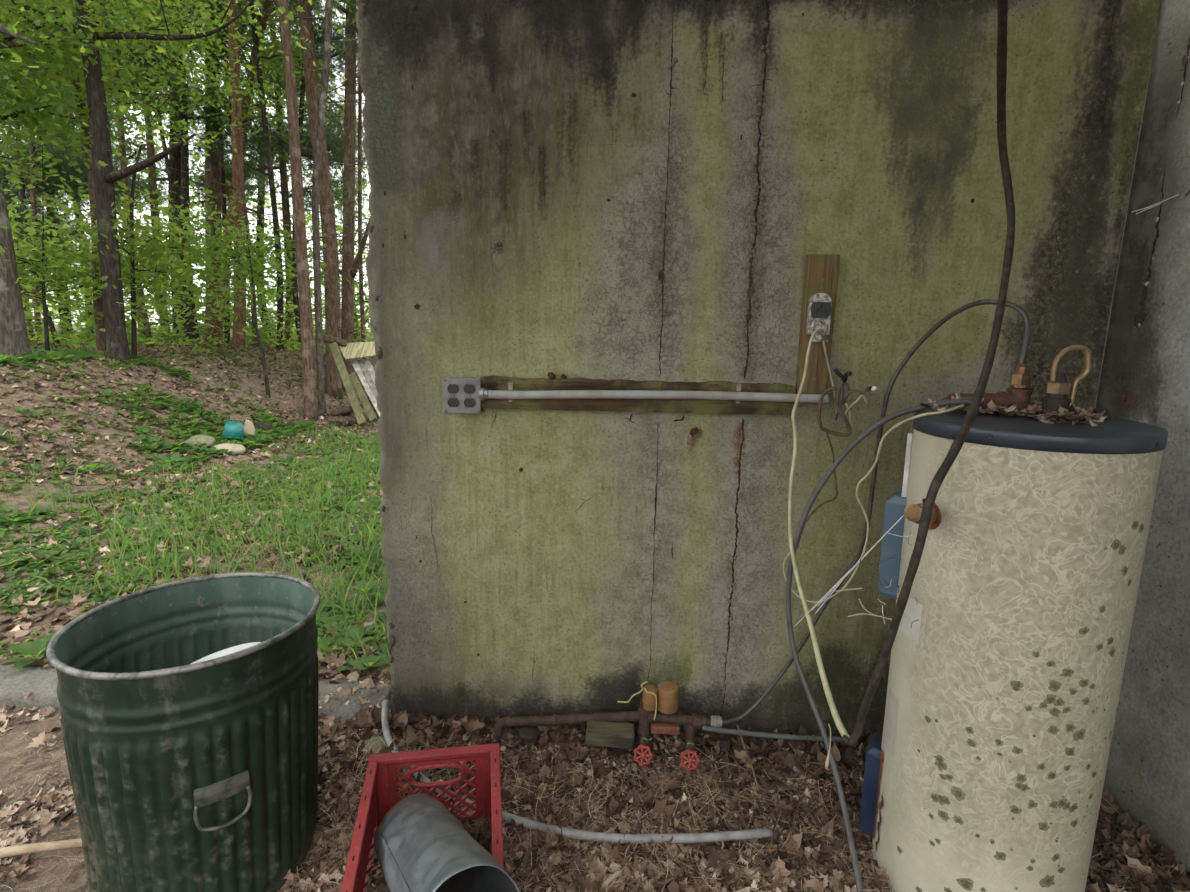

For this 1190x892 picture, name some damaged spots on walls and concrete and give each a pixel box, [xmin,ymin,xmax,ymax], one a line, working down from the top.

water stain [360,0,774,196]
crack [654,0,778,380]
water stain [791,0,997,226]
crack [718,418,746,707]
water stain [388,649,890,740]